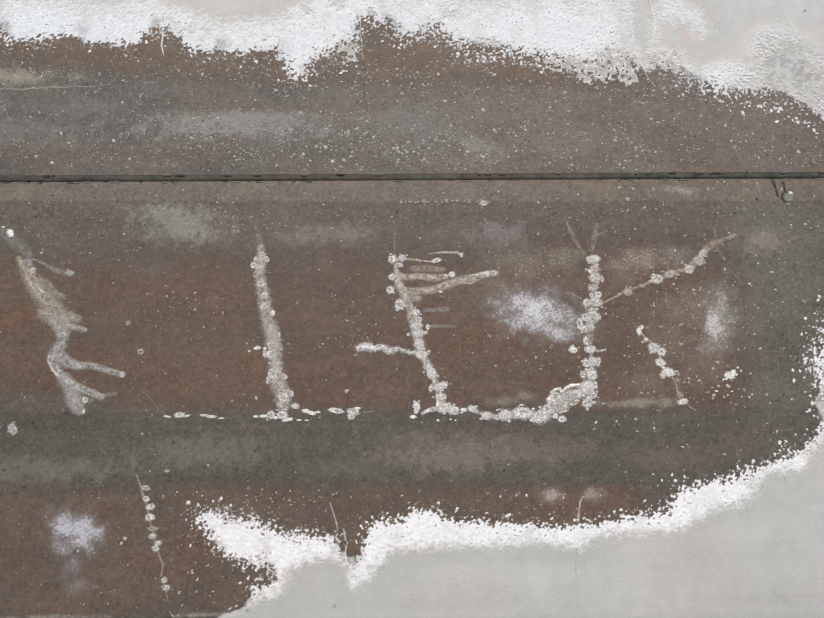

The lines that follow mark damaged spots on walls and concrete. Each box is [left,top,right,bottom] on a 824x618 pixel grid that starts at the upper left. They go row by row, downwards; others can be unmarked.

rust [0,15,627,84]
peeling [337,40,360,62]
leakage [0,0,824,176]
peeling [544,45,690,85]
rust [0,240,744,412]
leakage [0,178,824,618]
rust [0,484,650,615]